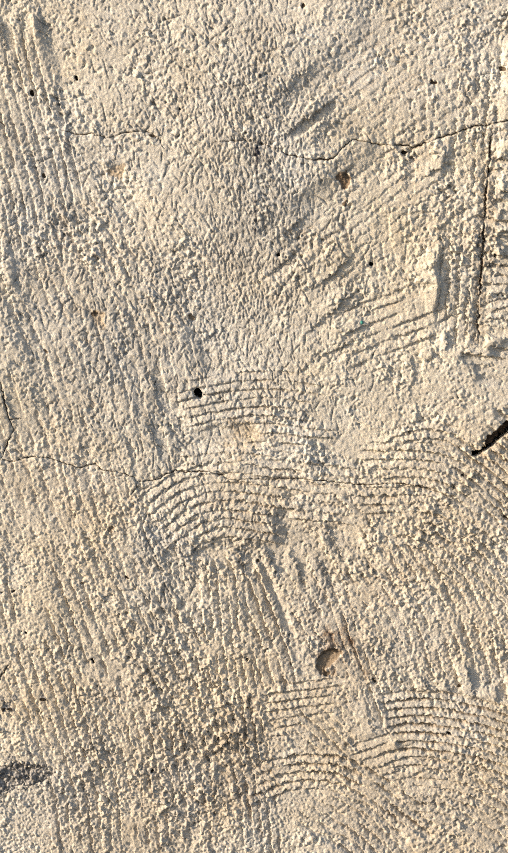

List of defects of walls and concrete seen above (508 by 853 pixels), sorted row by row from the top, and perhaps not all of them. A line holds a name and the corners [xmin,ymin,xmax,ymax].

crack [60,129,164,148]
crack [215,120,508,335]
crack [0,382,452,497]
spalling [485,420,508,446]
spalling [0,694,17,717]
spalling [0,751,58,797]